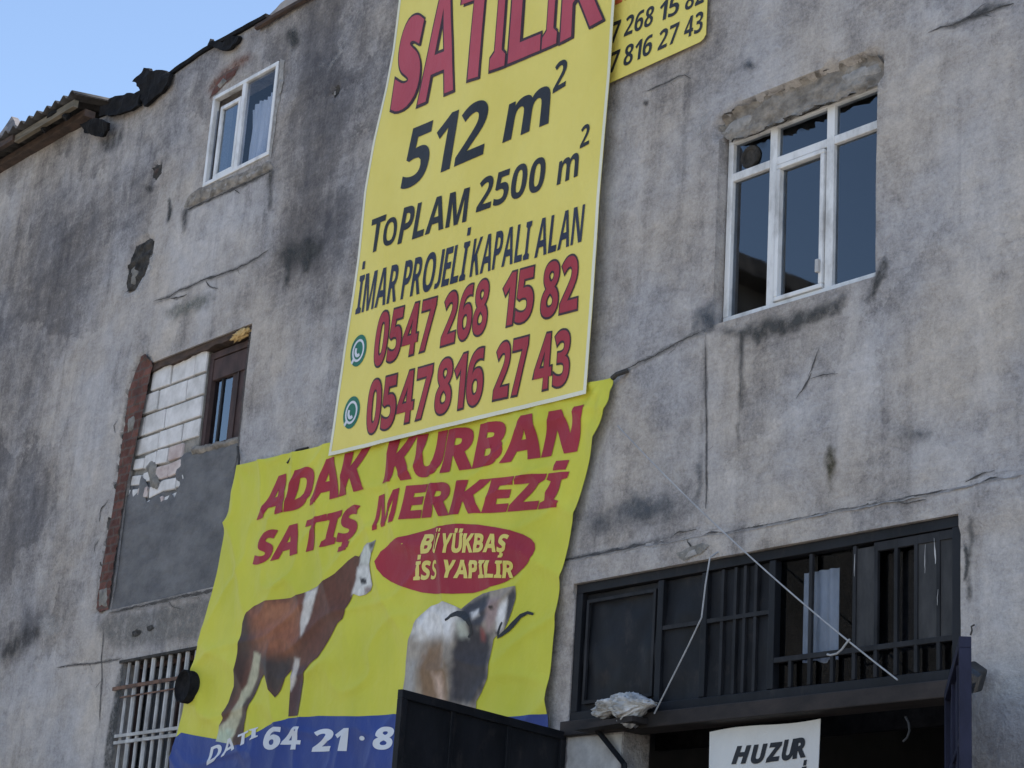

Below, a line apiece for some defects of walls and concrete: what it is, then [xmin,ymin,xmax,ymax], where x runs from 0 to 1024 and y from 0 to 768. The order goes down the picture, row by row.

crack [928,3,1014,33]
flaking render [209,65,239,99]
flaking render [718,55,884,140]
flaking render [126,239,154,292]
crack [153,250,268,304]
leakage [729,301,840,351]
crack [565,330,1022,562]
flaking render [96,354,153,612]
crack [57,589,213,718]